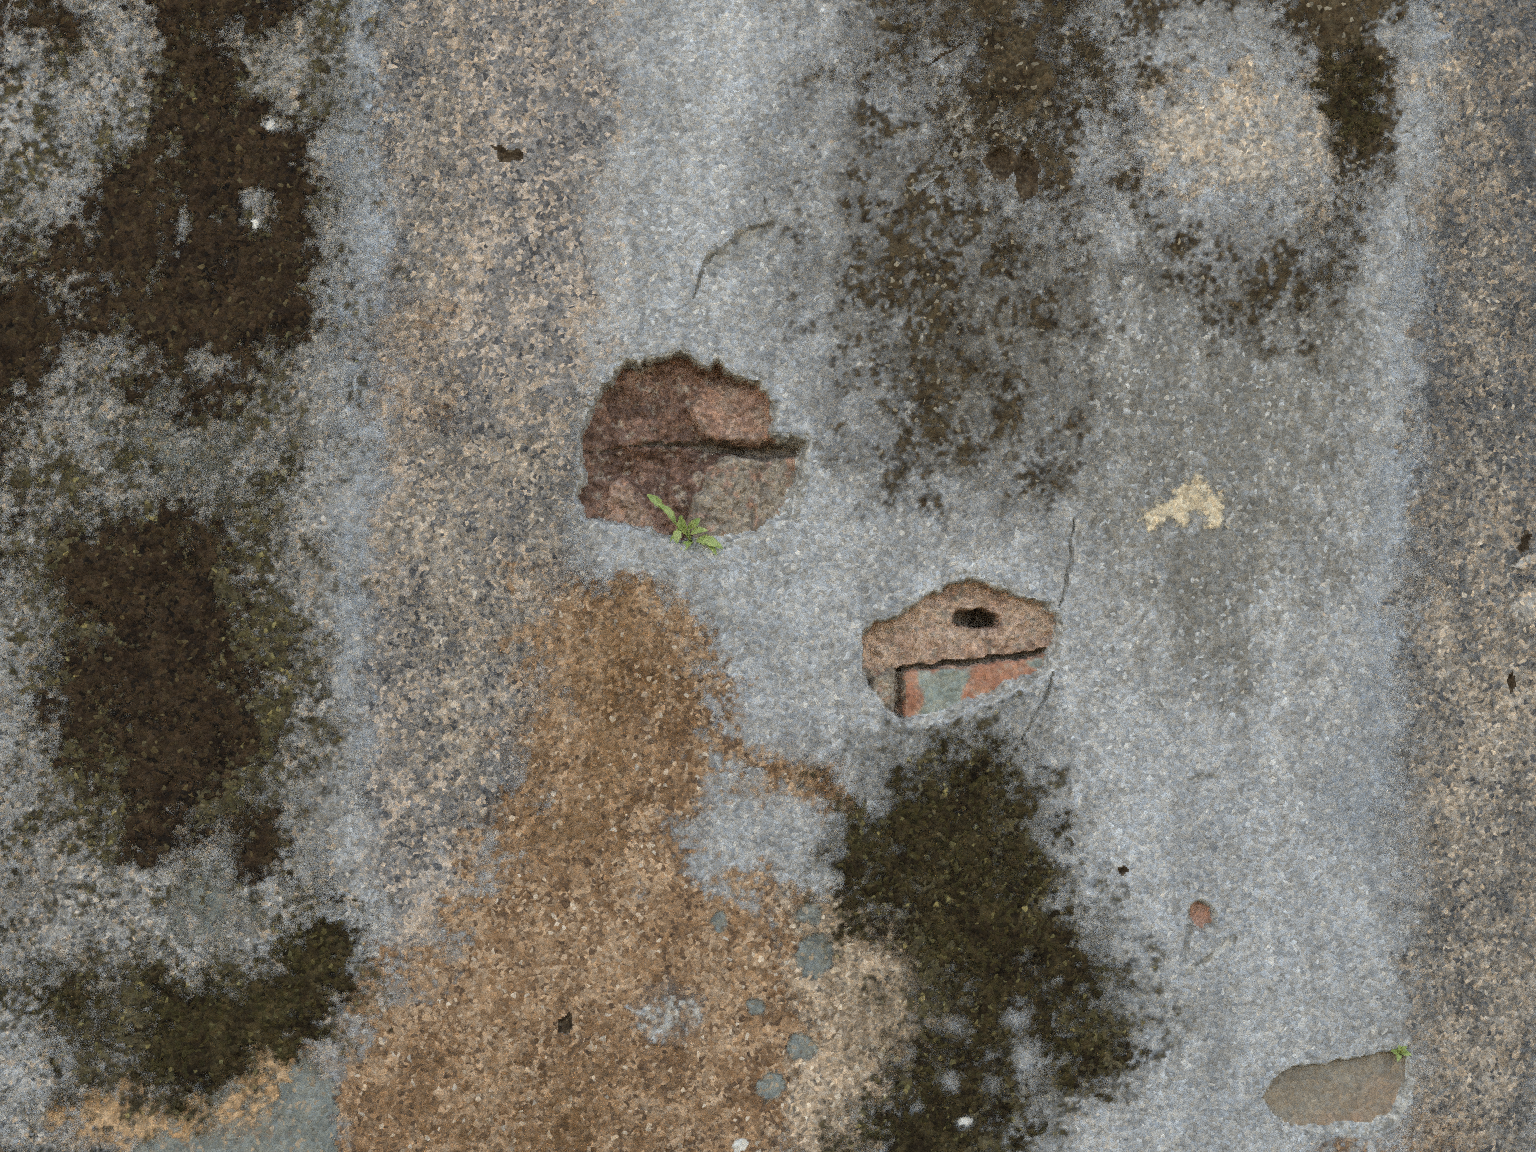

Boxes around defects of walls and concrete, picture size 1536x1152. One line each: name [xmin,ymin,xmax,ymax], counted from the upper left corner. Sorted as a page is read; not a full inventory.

water stain [0,0,633,1060]
spalling [576,350,829,575]
spalling [862,576,1063,726]
crack [1022,671,1055,739]
crack [1059,517,1076,606]
water stain [781,0,1536,1152]
spalling [1261,1048,1414,1137]